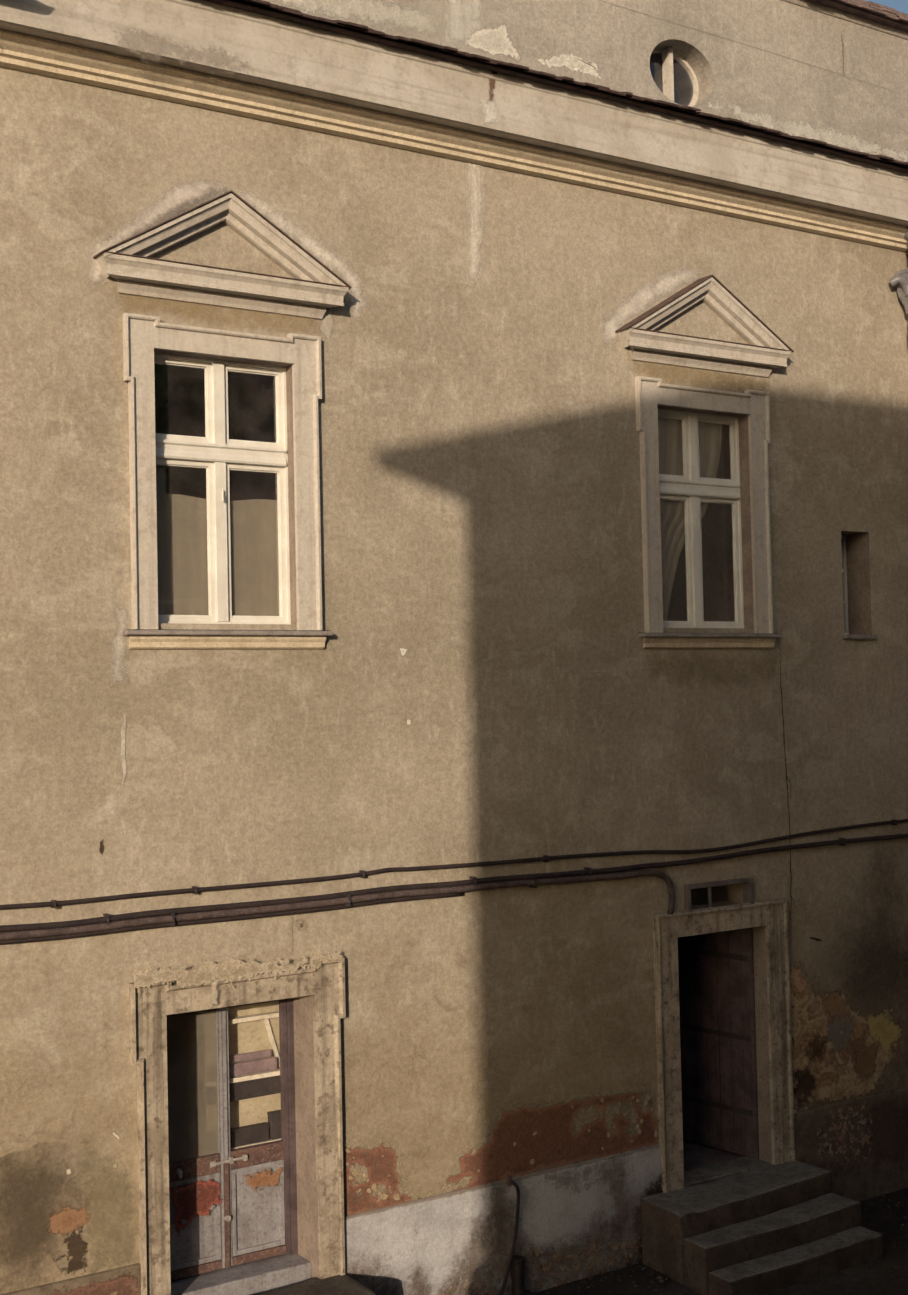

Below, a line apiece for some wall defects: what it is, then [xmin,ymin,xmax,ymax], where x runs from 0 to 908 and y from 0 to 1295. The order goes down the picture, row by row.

peeling [538,53,602,80]
water stain [467,162,483,278]
peeling [790,963,905,1164]
peeling [343,1087,659,1215]
water stain [0,1157,75,1269]
peeling [48,1206,140,1295]
water stain [347,1176,662,1295]